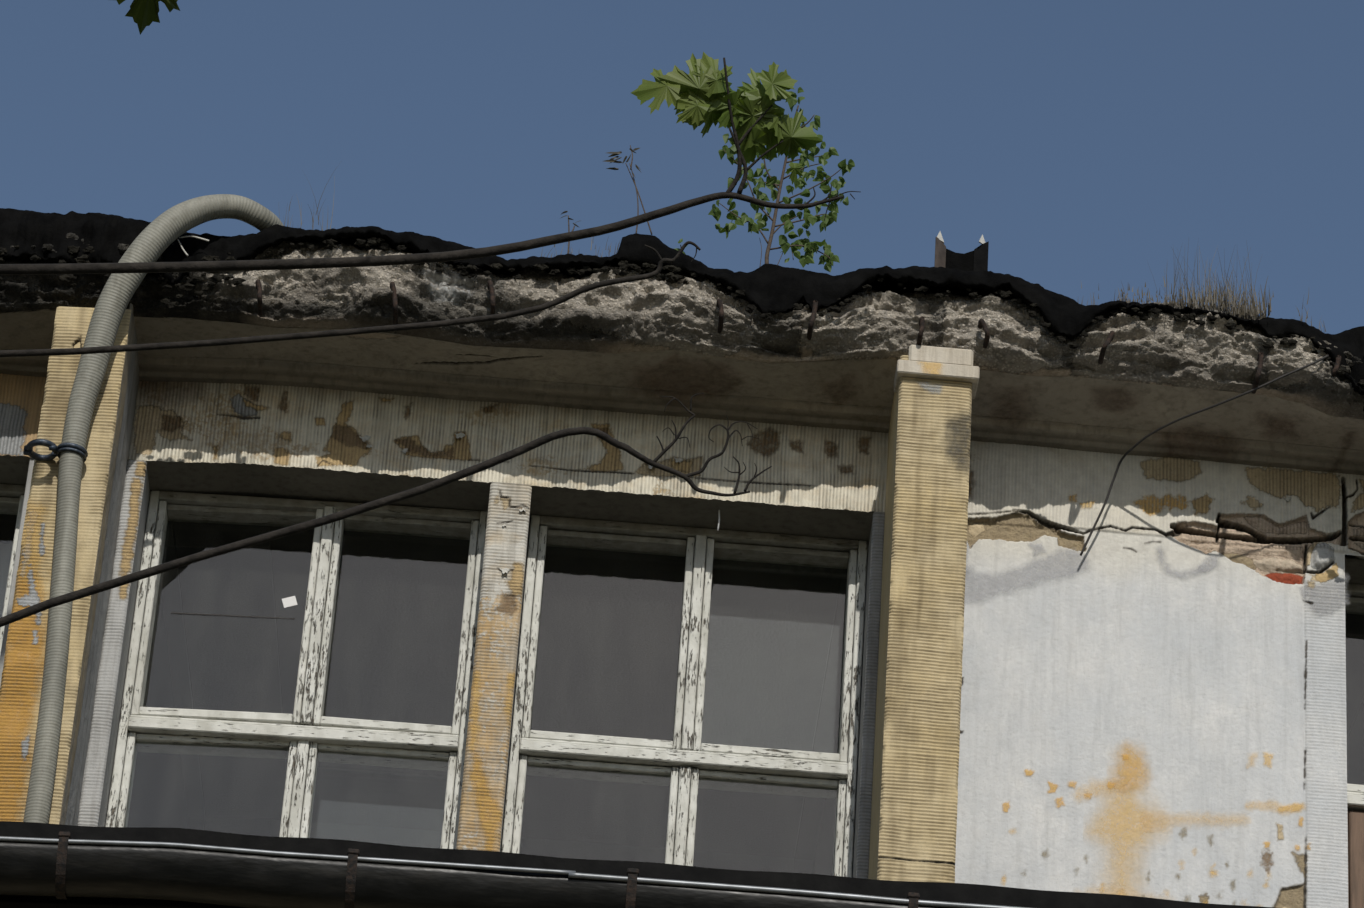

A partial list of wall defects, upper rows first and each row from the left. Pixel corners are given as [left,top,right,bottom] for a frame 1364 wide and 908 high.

spalling [192,247,475,308]
crack [422,354,537,364]
spalling [501,269,754,357]
spalling [800,291,1331,394]
peeling [0,403,28,456]
peeling [315,401,372,466]
peeling [394,432,471,461]
spalling [967,513,1086,552]
crack [968,479,1364,604]
spalling [1136,457,1364,588]
crack [1301,641,1309,698]
crack [1301,839,1309,908]